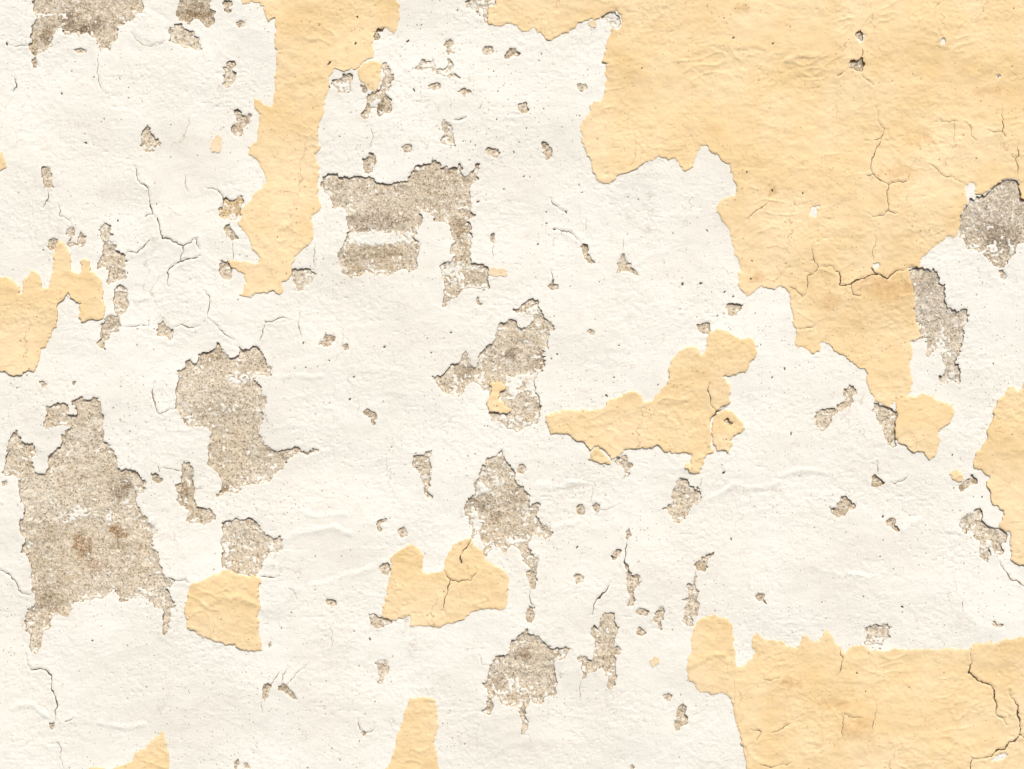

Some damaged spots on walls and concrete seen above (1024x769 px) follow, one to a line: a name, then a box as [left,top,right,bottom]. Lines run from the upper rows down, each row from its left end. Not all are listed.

crack [129,169,200,282]
peeling [168,0,515,307]
peeling [432,0,1024,523]
crack [791,245,907,298]
crack [868,120,959,216]
spalling [2,397,283,654]
spalling [175,342,319,497]
crack [443,540,477,611]
peeling [369,450,554,640]
peeling [949,383,1024,565]
spalling [482,606,621,734]
crack [968,651,1022,769]